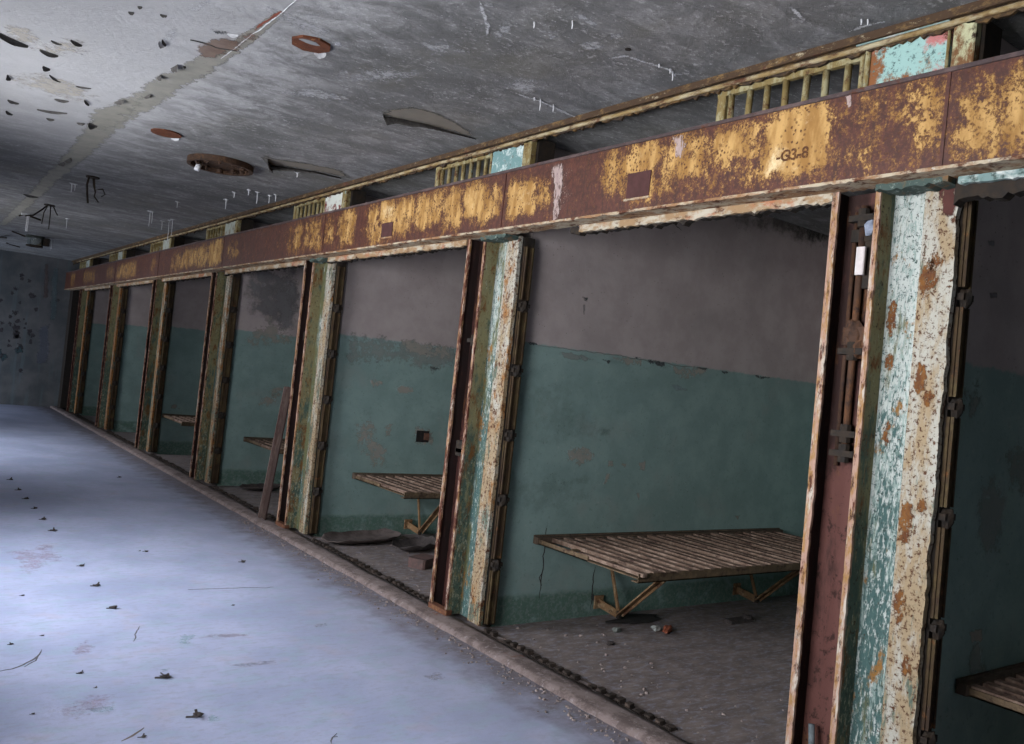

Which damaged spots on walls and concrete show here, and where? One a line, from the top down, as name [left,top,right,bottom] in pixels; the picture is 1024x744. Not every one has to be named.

flaking render [0,12,284,225]
rust [918,252,946,302]
rust [886,300,897,337]
peeling [528,342,708,391]
rust [884,353,894,371]
rust [913,362,936,407]
rust [896,498,928,545]
crack [539,528,547,598]
rust [892,589,910,626]
rust [901,655,911,675]